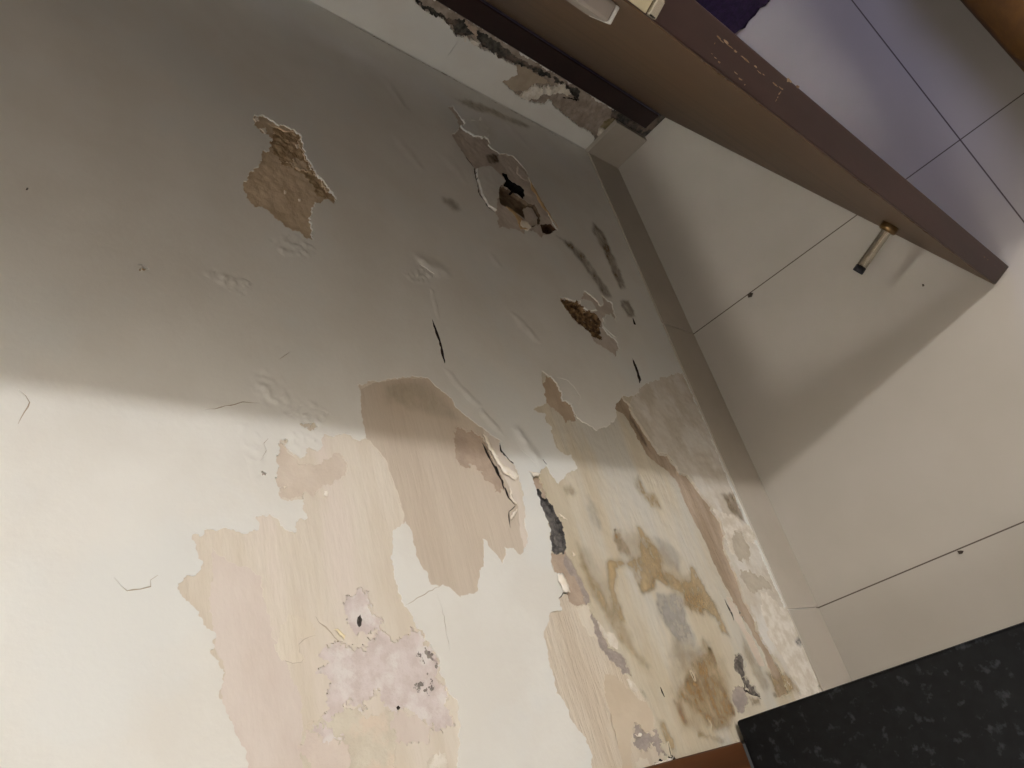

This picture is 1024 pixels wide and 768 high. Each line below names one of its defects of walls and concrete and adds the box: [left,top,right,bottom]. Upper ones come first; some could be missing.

spalling [415,0,645,140]
spalling [243,116,336,240]
spalling [448,107,559,238]
crack [432,319,445,363]
spalling [560,292,621,356]
peeling [178,376,676,768]
leakage [533,371,822,760]
spalling [615,398,787,713]